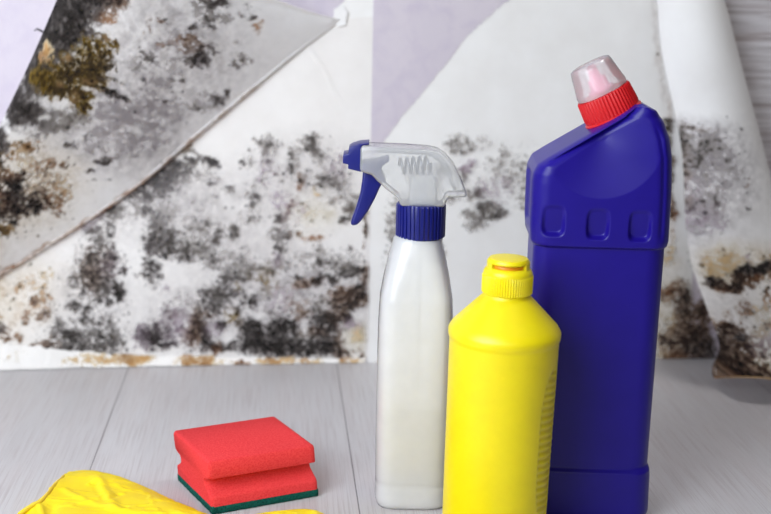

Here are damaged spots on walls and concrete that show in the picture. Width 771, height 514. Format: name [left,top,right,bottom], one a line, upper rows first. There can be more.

peeling [0,0,340,277]
water stain [0,131,369,359]
water stain [384,134,527,253]
water stain [662,117,750,268]
water stain [656,279,771,378]